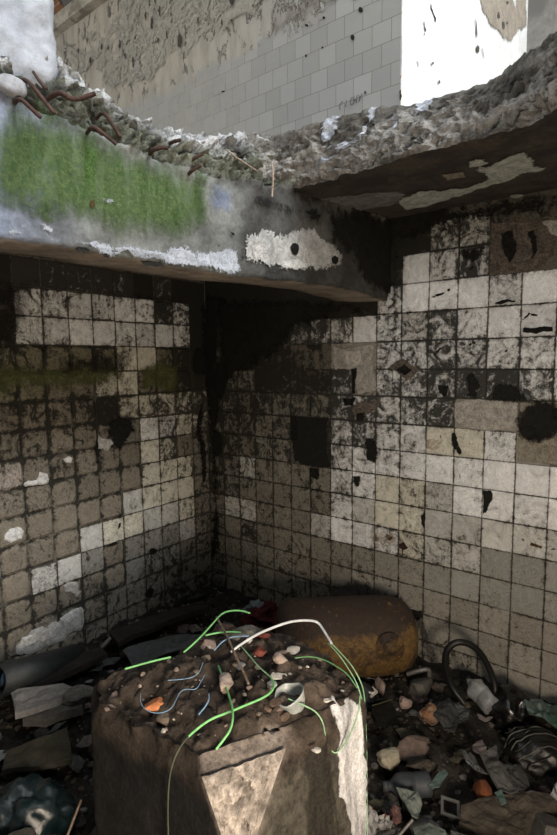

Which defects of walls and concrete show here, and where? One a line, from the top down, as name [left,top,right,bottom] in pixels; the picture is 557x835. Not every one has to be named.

peeling [57,0,274,91]
spalling [12,70,97,119]
spalling [85,111,122,146]
spalling [148,138,182,156]
spalling [187,152,204,176]
peeling [321,153,546,211]
water stain [75,240,241,276]
peeling [241,226,343,271]
peeling [489,219,557,275]
peeling [288,404,330,491]
peeling [454,399,557,466]
spalling [202,748,286,835]